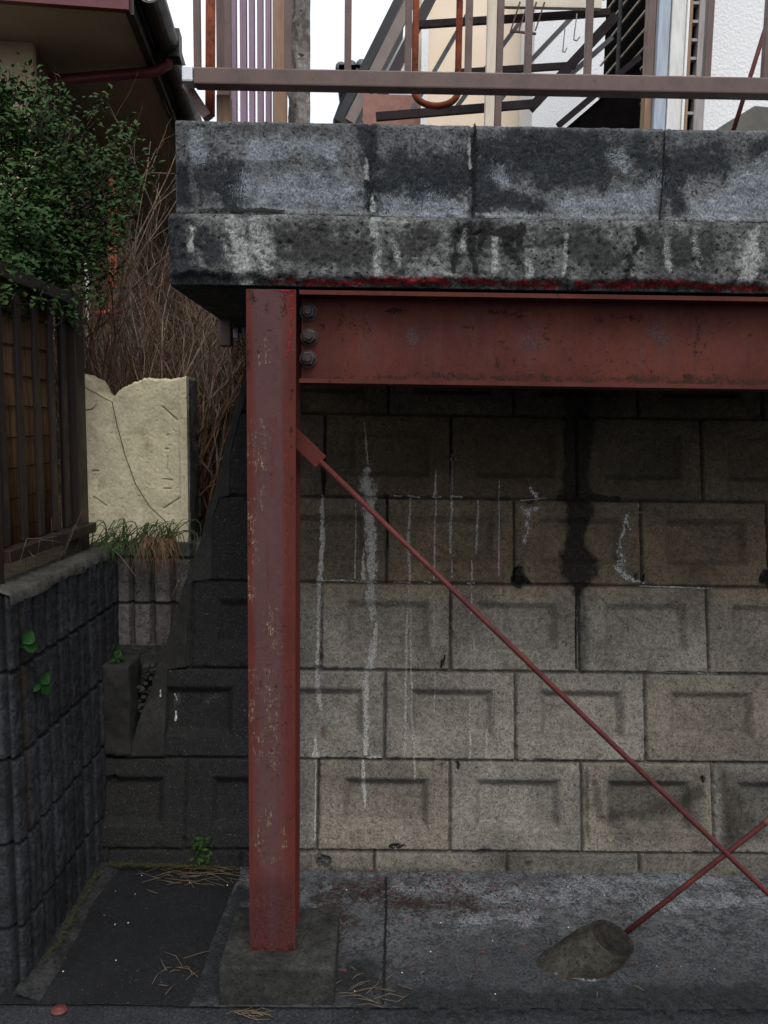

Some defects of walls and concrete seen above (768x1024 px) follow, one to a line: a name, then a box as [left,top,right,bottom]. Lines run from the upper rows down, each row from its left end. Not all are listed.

water stain [225,215,275,285]
water stain [369,218,401,278]
water stain [443,219,534,278]
water stain [622,227,649,284]
water stain [664,237,672,272]
water stain [735,229,763,287]
water stain [557,389,621,594]
efflorescence [466,499,479,616]
efflorescence [314,421,382,808]
efflorescence [394,454,463,781]
efflorescence [311,735,319,841]